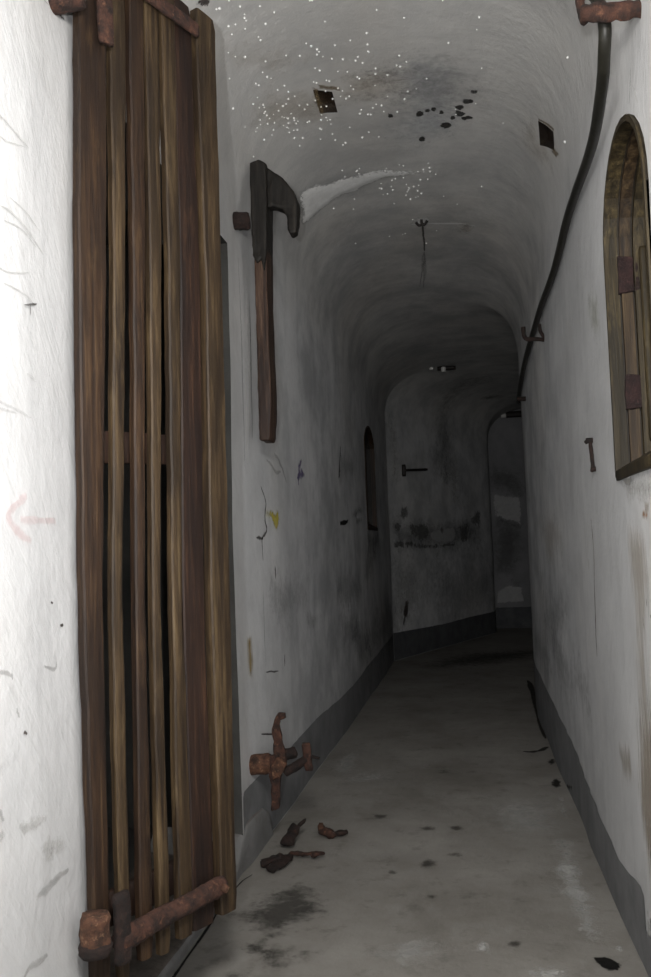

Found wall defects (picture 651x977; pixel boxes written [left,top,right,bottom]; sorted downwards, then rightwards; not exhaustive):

leakage [416,90,478,129]